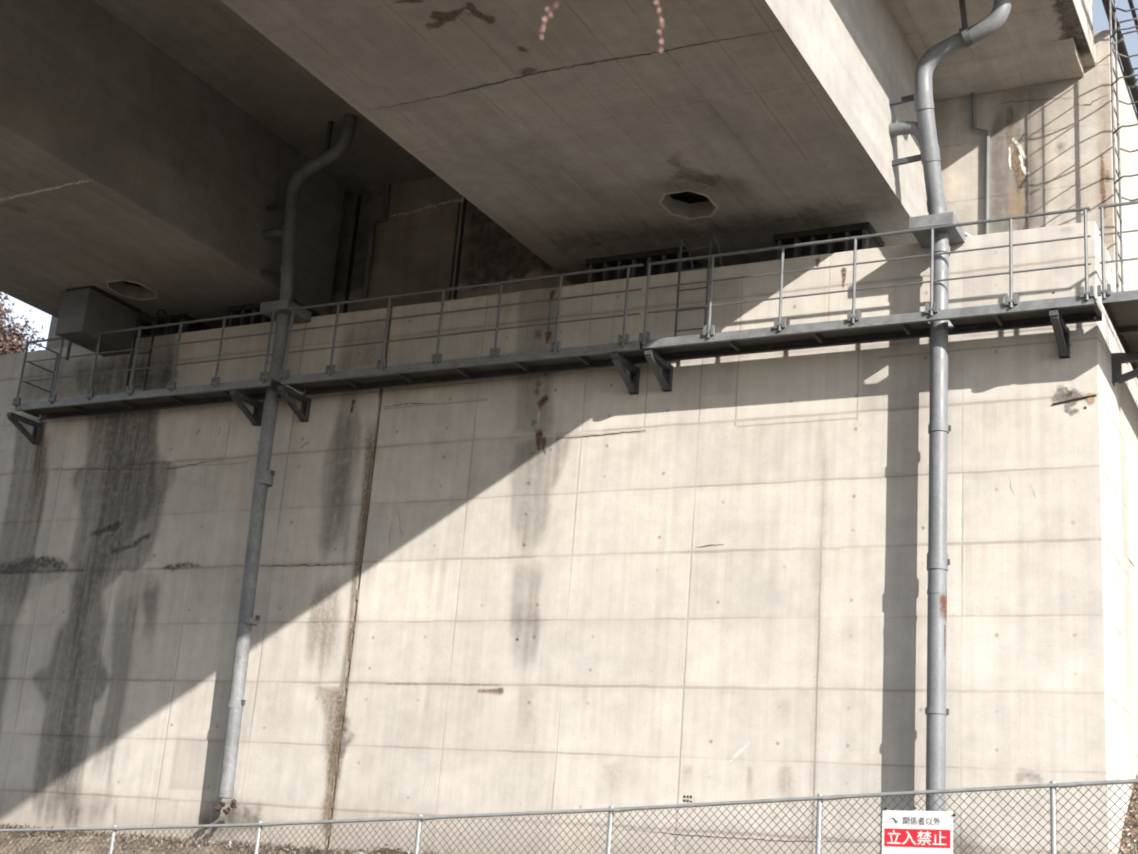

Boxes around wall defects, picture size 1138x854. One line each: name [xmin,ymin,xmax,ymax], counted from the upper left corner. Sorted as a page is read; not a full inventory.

spalling [426,3,494,28]
crack [366,30,780,111]
spalling [1052,387,1096,413]
leakage [1,557,64,573]